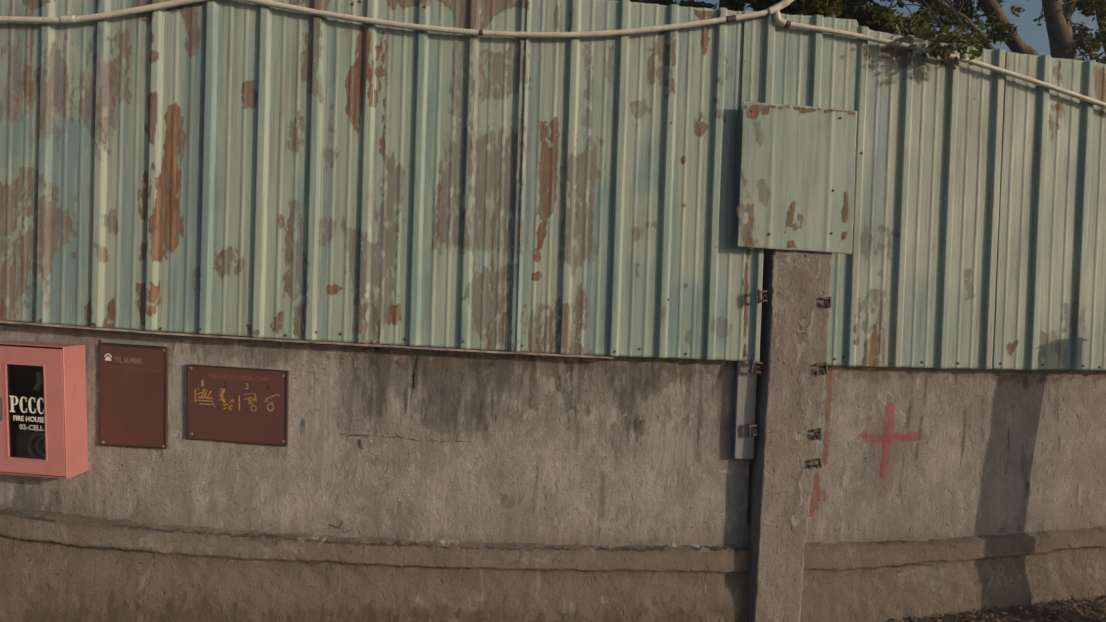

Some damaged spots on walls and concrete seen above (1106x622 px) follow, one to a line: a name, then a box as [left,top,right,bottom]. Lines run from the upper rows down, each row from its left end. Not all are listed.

corrosion [133,0,207,63]
corrosion [345,26,388,156]
peeling [479,40,531,99]
peeling [0,167,76,324]
corrosion [137,92,186,262]
peeling [322,153,404,341]
peeling [432,120,525,350]
corrosion [531,117,559,281]
peeling [510,284,592,358]
peeling [560,137,603,274]